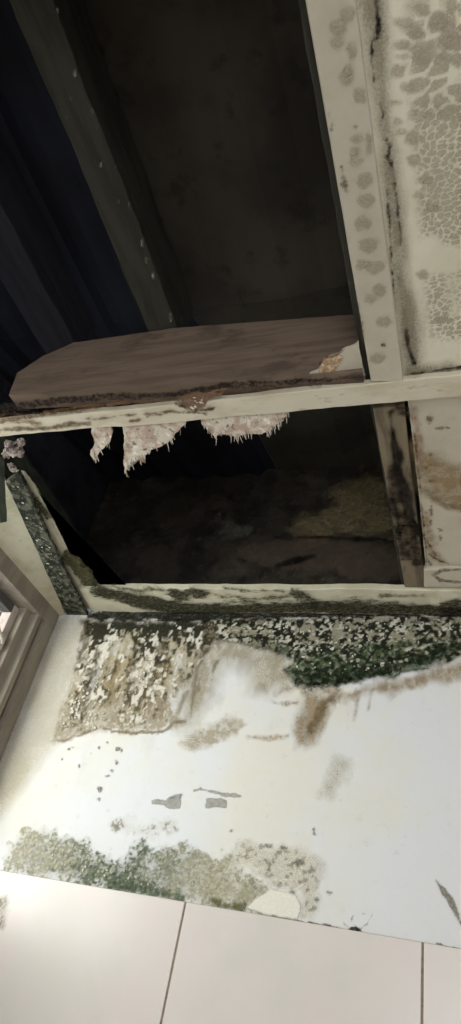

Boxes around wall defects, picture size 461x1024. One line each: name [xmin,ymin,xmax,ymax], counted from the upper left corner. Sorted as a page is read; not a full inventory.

water stain [362,0,452,375]
water stain [385,404,461,583]
peeling [54,686,185,742]
water stain [0,550,461,804]
peeling [152,794,182,809]
peeling [206,798,227,808]
water stain [3,827,331,915]